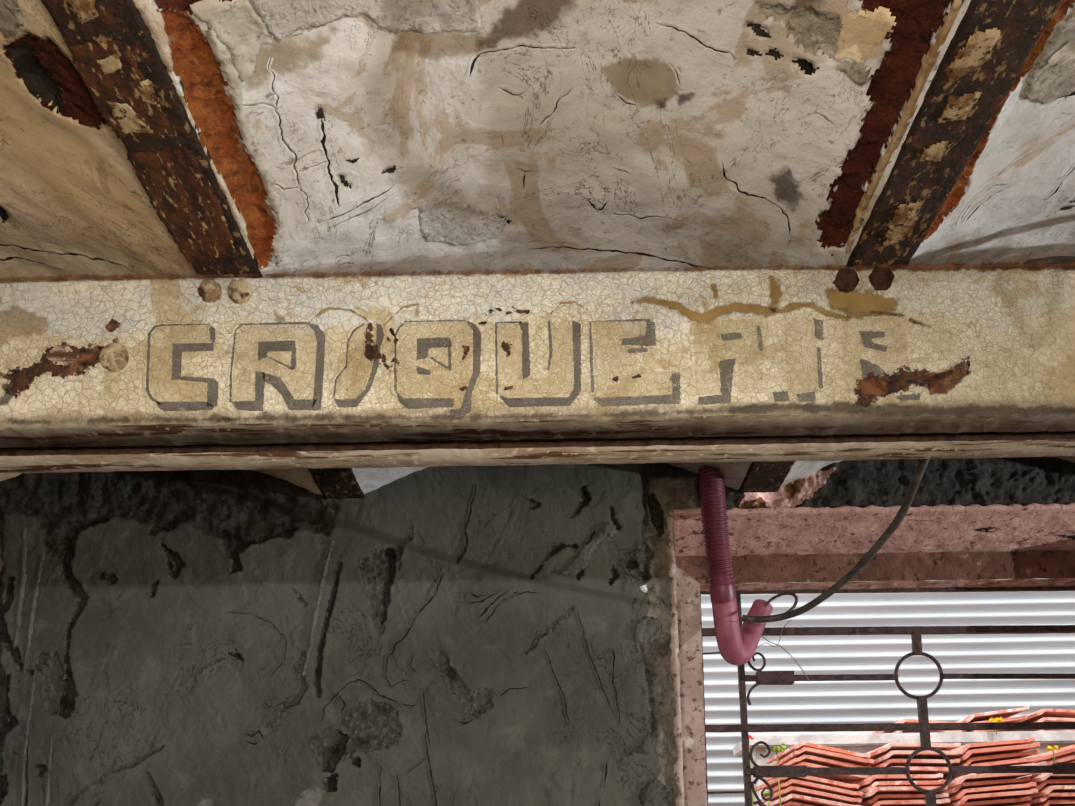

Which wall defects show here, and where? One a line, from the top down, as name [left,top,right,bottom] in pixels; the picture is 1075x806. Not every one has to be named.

flaking render [155,0,484,270]
flaking render [922,0,1075,243]
crack [1044,164,1075,200]
flaking render [415,196,512,247]
rust [0,319,120,405]
rust [854,356,971,407]
flaking render [648,493,664,538]
flaking render [621,539,654,593]
crack [320,483,478,806]
crack [542,648,571,725]
crack [575,610,622,724]
crack [596,762,609,806]